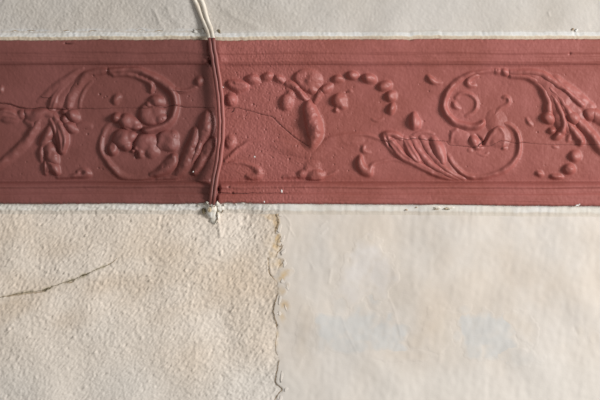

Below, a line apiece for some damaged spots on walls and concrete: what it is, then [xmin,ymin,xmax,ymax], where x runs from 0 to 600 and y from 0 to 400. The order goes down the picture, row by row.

crack [1,97,105,110]
crack [0,258,117,298]